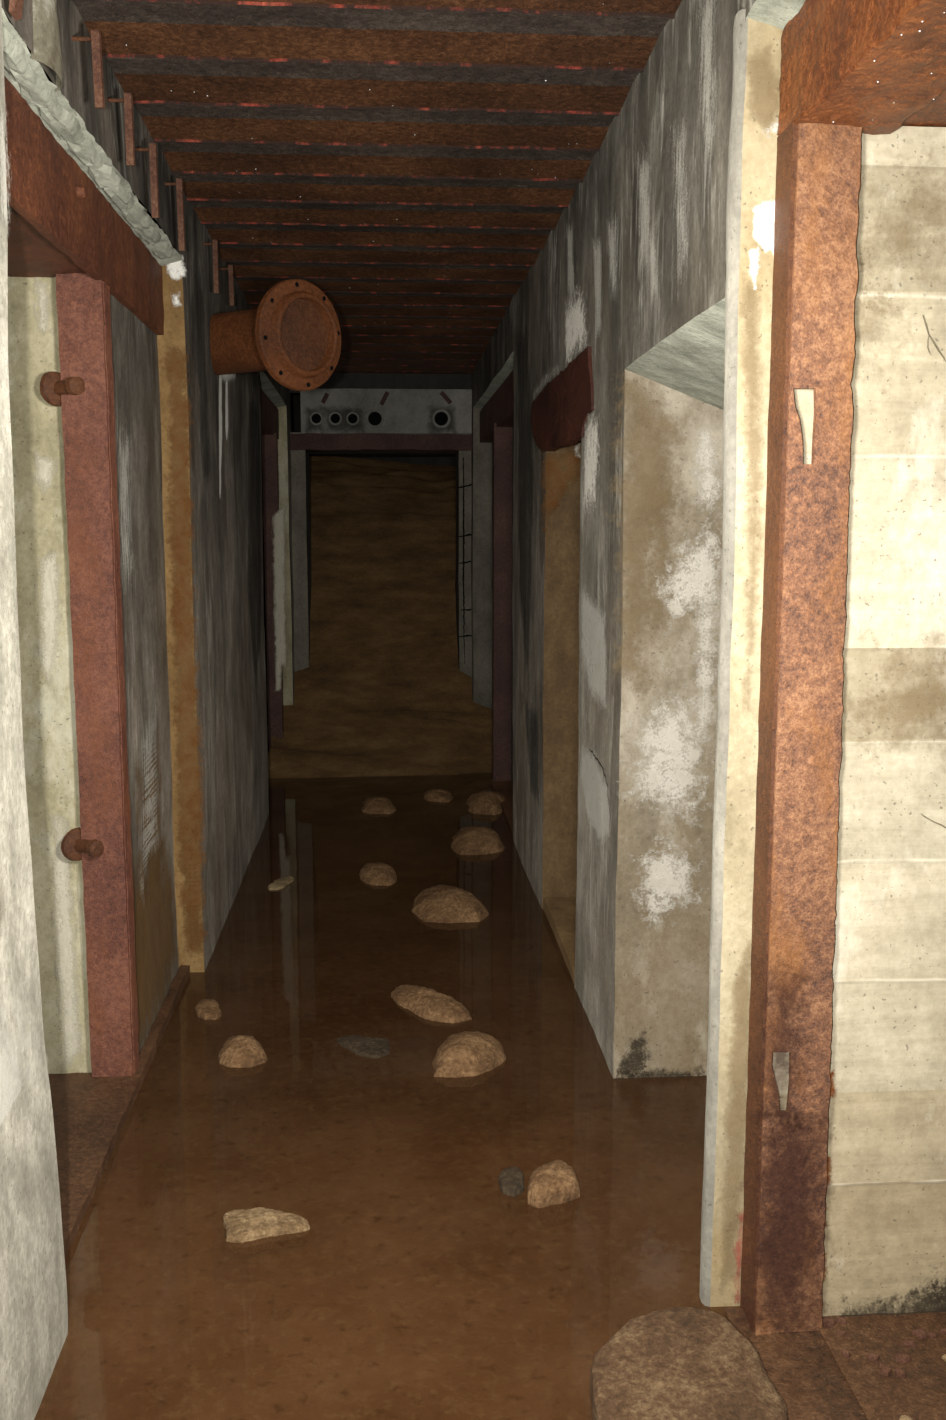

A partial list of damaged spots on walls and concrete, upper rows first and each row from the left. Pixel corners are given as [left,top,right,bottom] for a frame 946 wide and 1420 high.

water stain [749,201,775,289]
water stain [624,429,722,923]
water stain [616,1032,706,1079]
water stain [842,1280,946,1317]